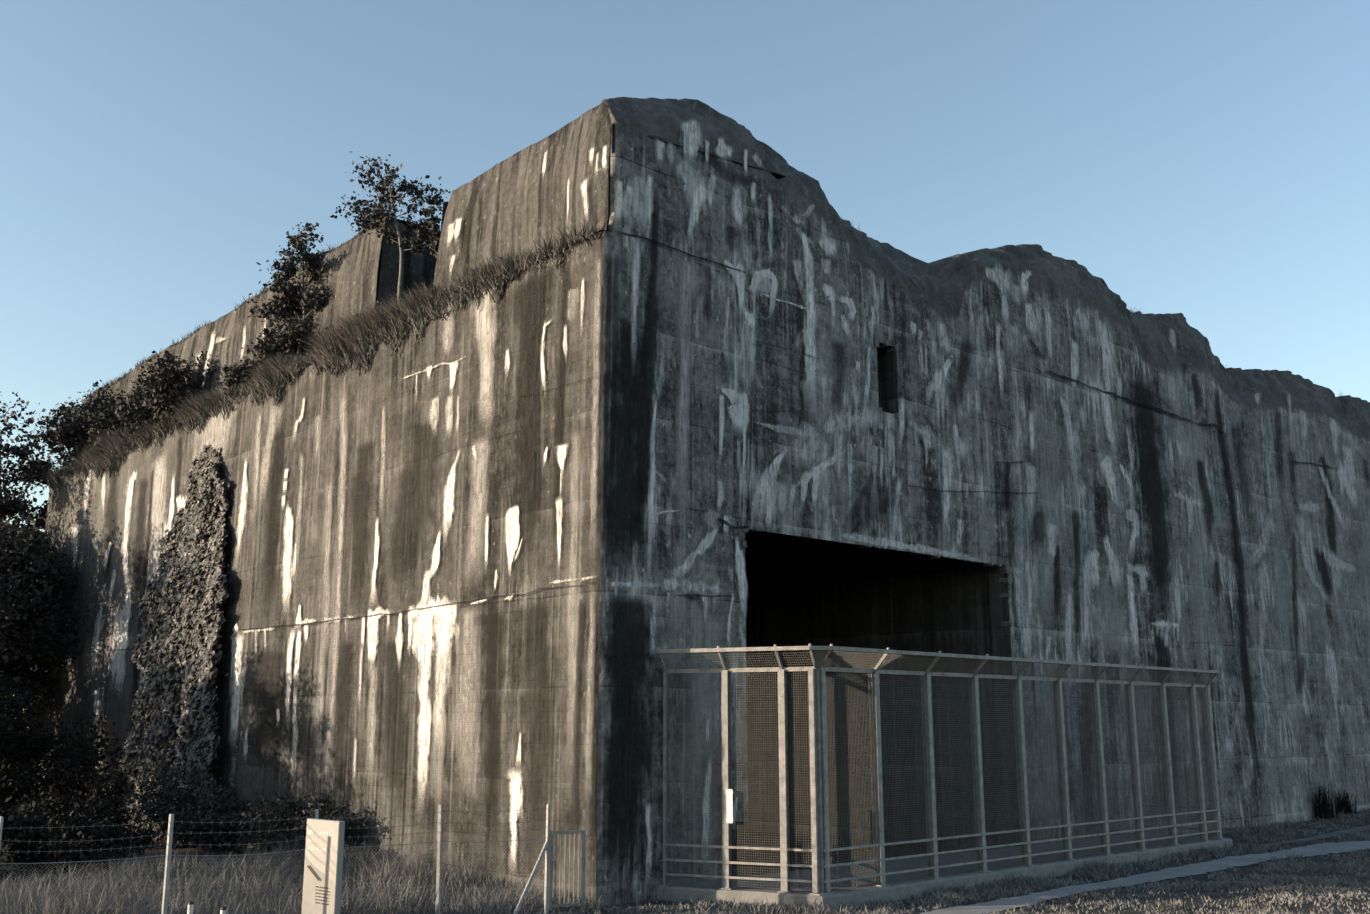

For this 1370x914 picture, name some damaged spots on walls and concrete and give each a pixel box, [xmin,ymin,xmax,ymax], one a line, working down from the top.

water stain [657,122,772,248]
water stain [445,307,458,387]
water stain [794,234,874,399]
water stain [986,268,1051,386]
water stain [71,391,236,731]
water stain [231,401,488,780]
efflorescence [755,454,784,522]
efflorescence [791,454,839,501]
water stain [1027,311,1178,806]
water stain [1183,364,1259,770]
water stain [1305,421,1370,594]
water stain [486,605,550,856]